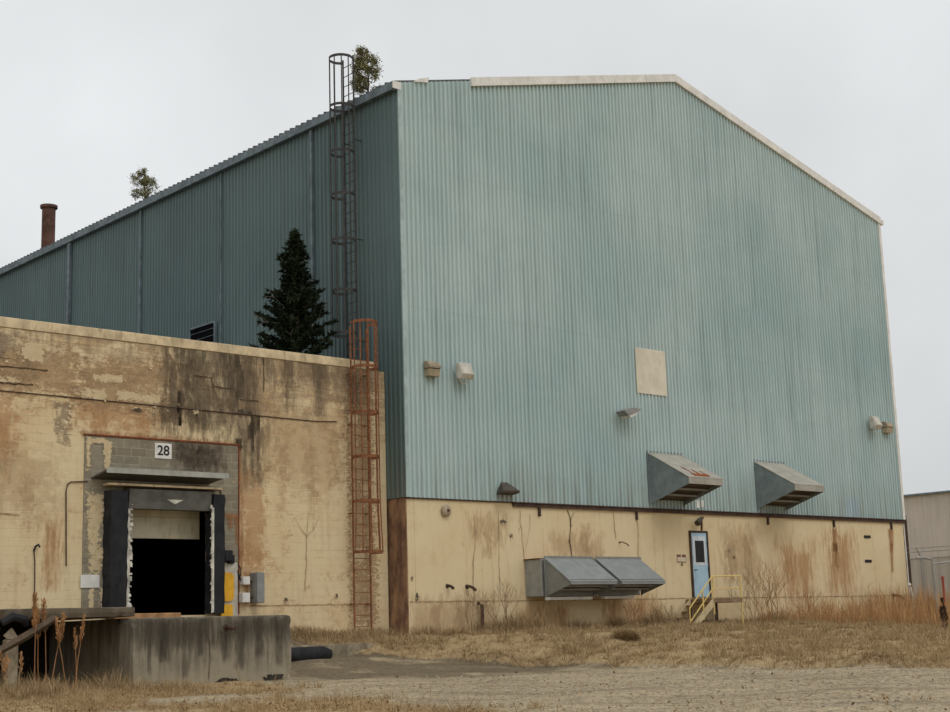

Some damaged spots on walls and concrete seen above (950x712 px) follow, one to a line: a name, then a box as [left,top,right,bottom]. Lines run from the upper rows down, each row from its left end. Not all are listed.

crack [0,357,48,385]
peeling [86,436,112,471]
peeling [85,491,104,575]
crack [243,516,375,607]
peeling [87,586,103,608]